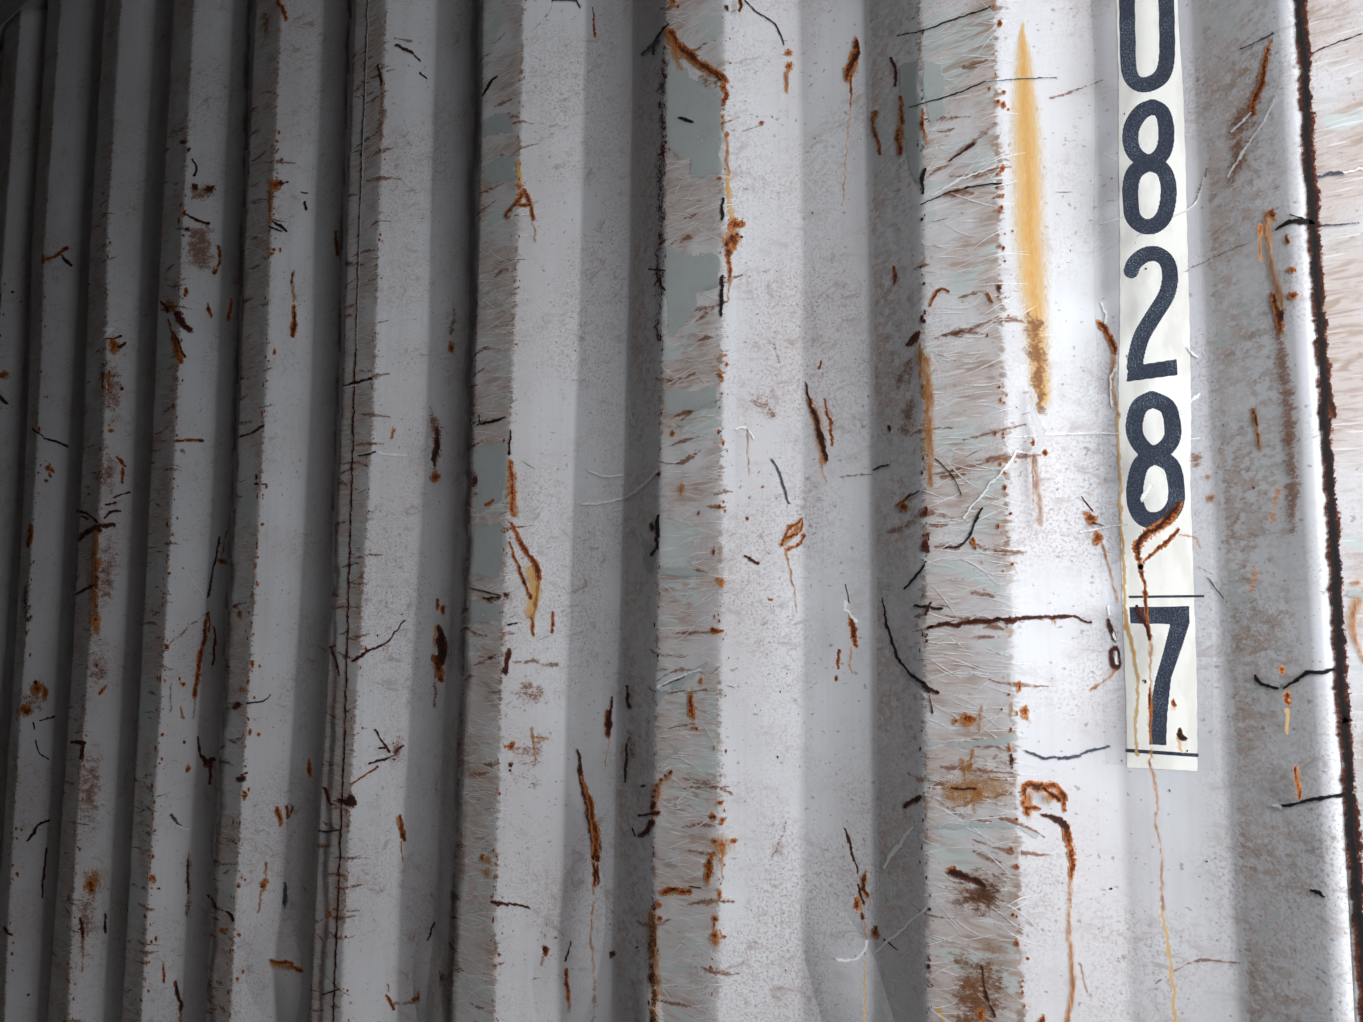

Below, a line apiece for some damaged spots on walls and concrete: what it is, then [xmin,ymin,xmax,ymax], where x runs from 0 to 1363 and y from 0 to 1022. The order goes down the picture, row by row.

peeling [465,600,503,626]
peeling [467,442,509,579]
corrosion [467,403,558,676]
peeling [664,387,717,416]
peeling [661,246,721,337]
peeling [663,48,724,178]
corrosion [648,21,773,351]
corrosion [988,23,1050,413]
corrosion [1227,39,1278,189]
corrosion [1257,0,1363,1022]
corrosion [636,746,738,1022]
corrosion [924,680,1088,1022]